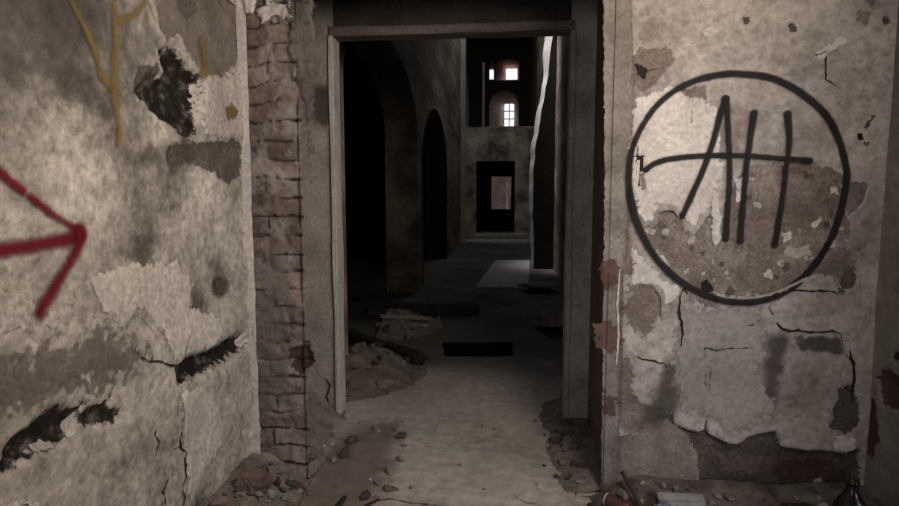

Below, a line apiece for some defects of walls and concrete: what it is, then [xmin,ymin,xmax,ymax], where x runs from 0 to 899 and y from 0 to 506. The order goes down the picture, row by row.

spalling [134,0,242,185]
spalling [592,0,899,491]
spalling [0,308,250,473]
spalling [288,340,316,376]
crack [637,288,688,371]
water stain [765,336,787,401]
crack [769,307,856,404]
crack [793,287,841,295]
water stain [797,336,843,354]